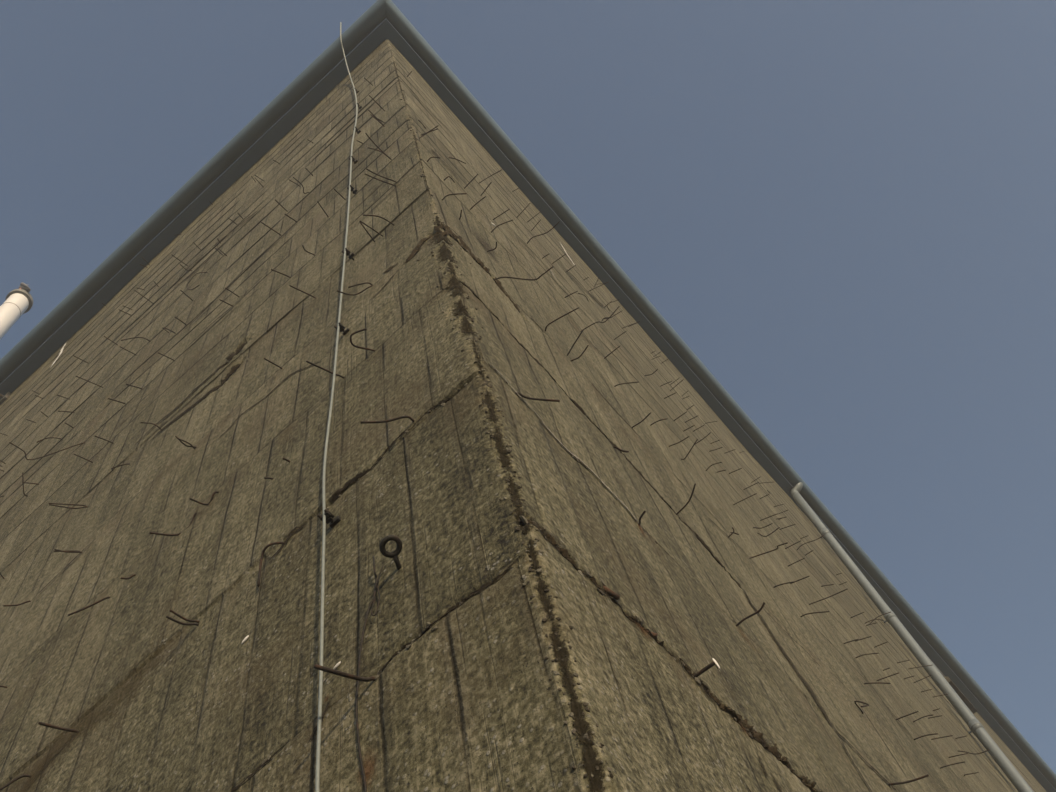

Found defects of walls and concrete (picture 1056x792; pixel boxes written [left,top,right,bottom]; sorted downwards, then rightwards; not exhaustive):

crack [215,361,321,441]
crack [327,383,468,510]
crack [459,280,819,665]
crack [268,525,305,559]